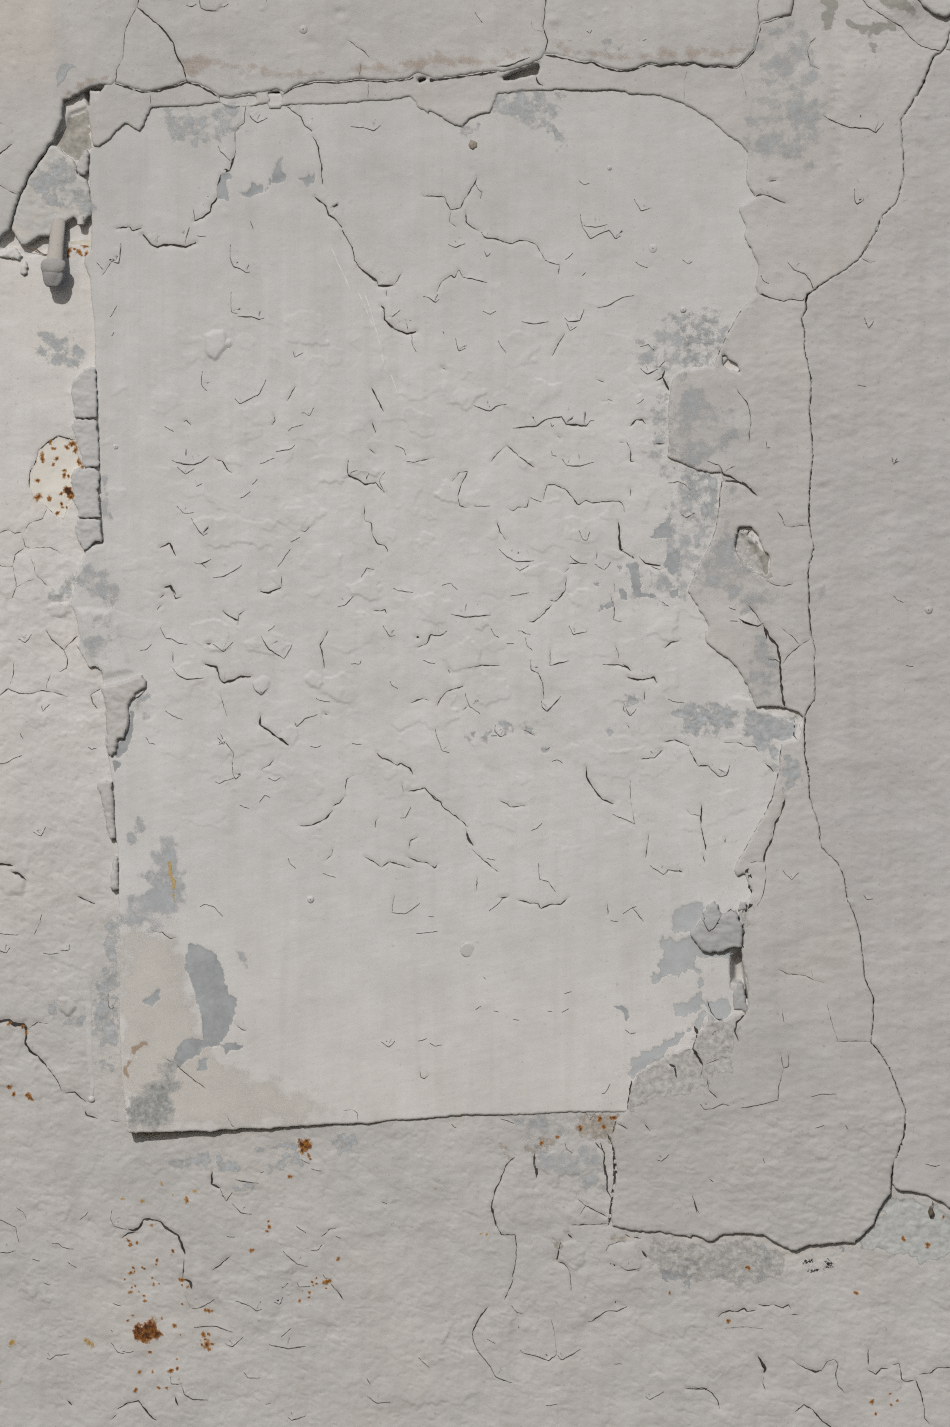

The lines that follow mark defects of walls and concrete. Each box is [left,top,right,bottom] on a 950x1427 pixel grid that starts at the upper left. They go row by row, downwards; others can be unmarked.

crack [531,0,792,98]
crack [0,123,47,224]
crack [115,0,497,352]
peeling [30,436,83,518]
corrosion [34,439,84,515]
peeling [411,467,718,714]
crack [586,0,949,1241]
peeling [88,675,156,843]
peeling [124,943,243,1132]
spalling [526,902,741,1153]
corrosion [298,1138,312,1160]
corrosion [124,1249,181,1353]